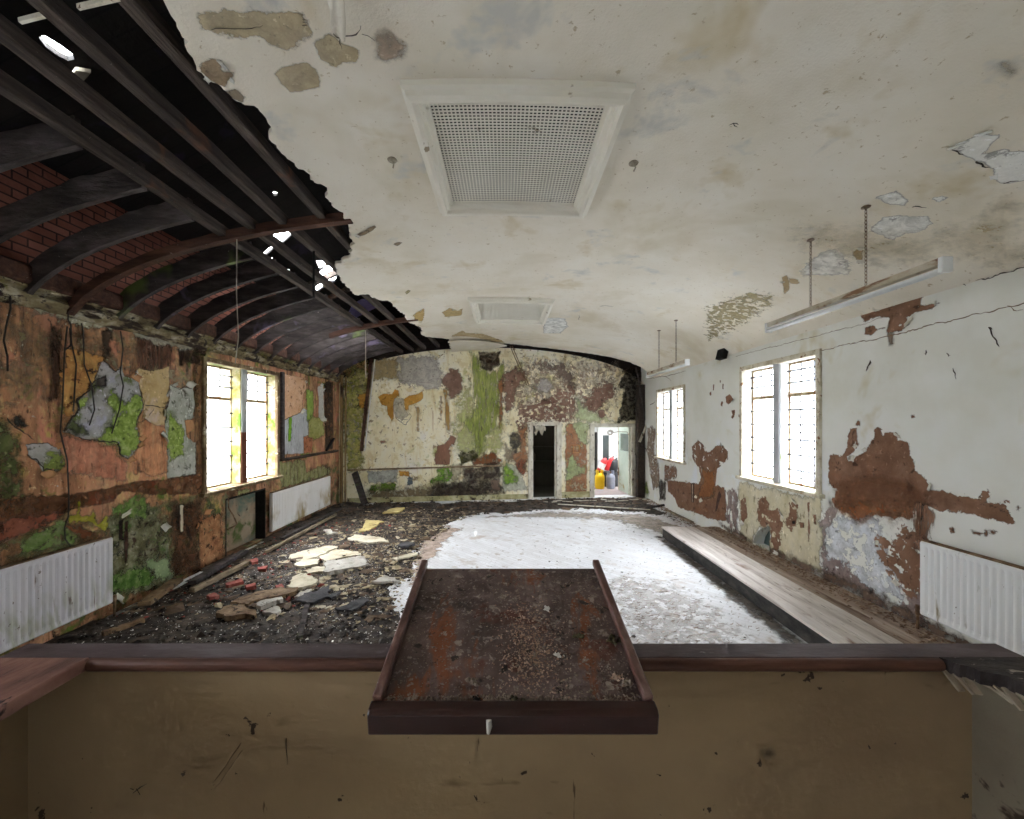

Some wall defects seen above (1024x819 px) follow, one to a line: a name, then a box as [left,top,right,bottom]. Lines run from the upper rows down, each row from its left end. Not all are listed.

peeling [197,9,358,92]
peeling [26,359,147,479]
water stain [0,313,225,576]
spalling [379,356,443,421]
water stain [478,351,501,371]
peeling [501,363,616,450]
peeling [666,441,728,521]
peeling [739,496,817,555]
crack [736,303,1024,378]
peeling [861,297,939,335]
peeling [828,421,1019,599]
crack [963,267,1024,286]